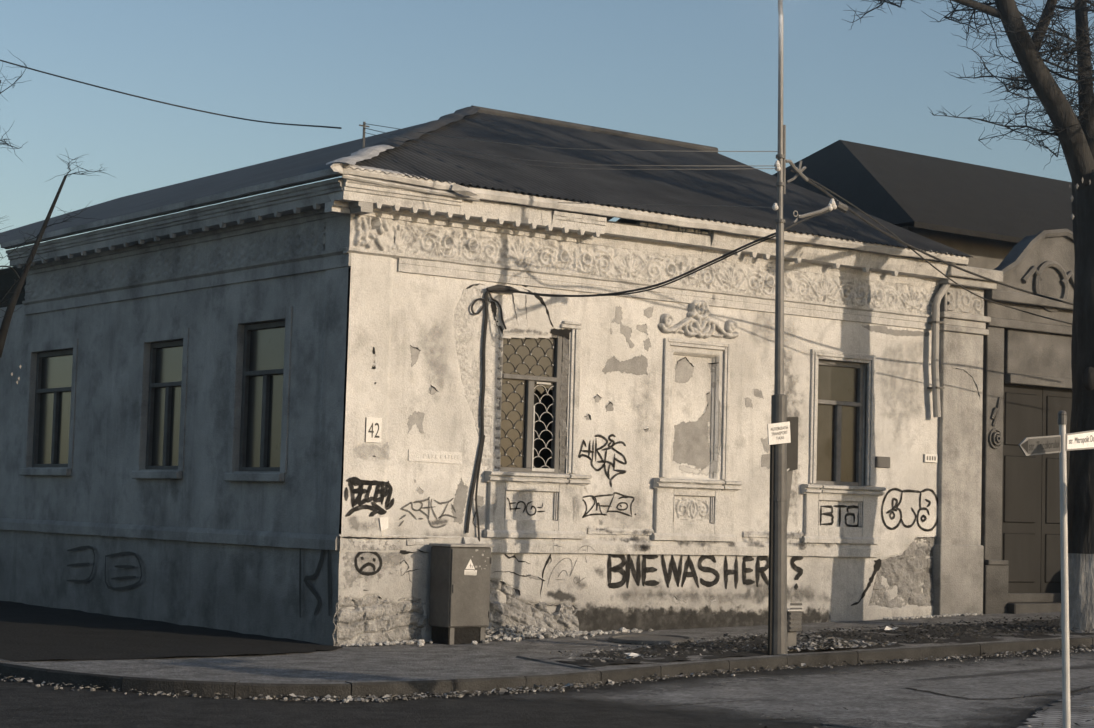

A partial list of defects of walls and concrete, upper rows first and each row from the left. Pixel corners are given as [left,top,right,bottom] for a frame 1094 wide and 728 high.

peeling [410,345,421,366]
spalling [454,285,572,474]
peeling [602,305,654,375]
peeling [675,356,694,383]
peeling [407,412,425,433]
peeling [673,362,722,476]
spalling [868,536,936,608]
spalling [332,595,427,647]
spalling [485,579,579,639]